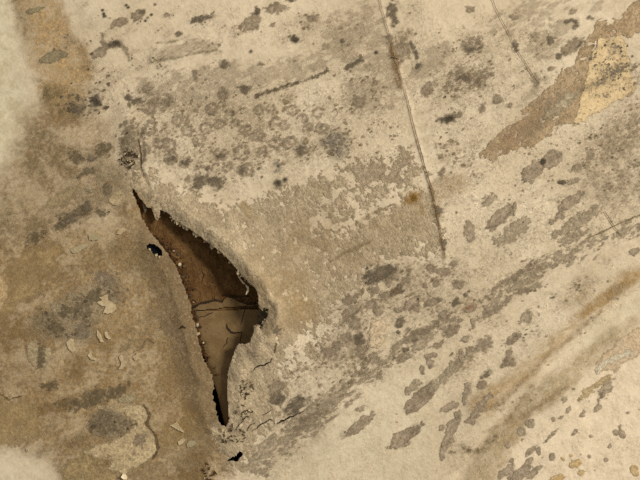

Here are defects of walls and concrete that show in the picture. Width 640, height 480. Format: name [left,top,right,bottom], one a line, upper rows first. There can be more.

leakage [0,0,229,480]
mould [125,56,385,196]
peeling [130,145,447,475]
crack [380,0,445,254]
leakage [242,219,640,480]
peeling [439,382,494,469]
crack [493,1,539,84]
peeling [479,0,640,163]